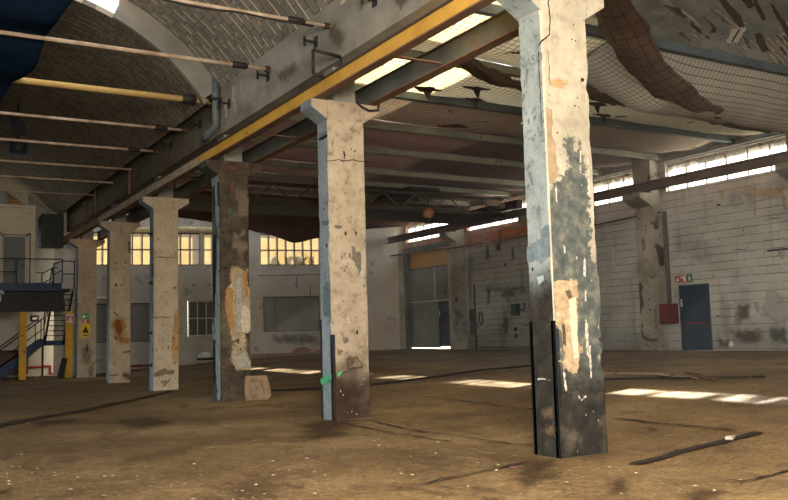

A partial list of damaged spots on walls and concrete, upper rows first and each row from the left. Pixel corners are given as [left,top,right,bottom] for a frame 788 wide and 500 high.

flaking render [719,0,746,44]
flaking render [742,0,788,38]
flaking render [755,33,769,53]
peeling [521,100,605,388]
spalling [211,175,251,400]
corrosion [113,319,128,342]
water stain [737,304,749,320]
water stain [719,328,786,351]